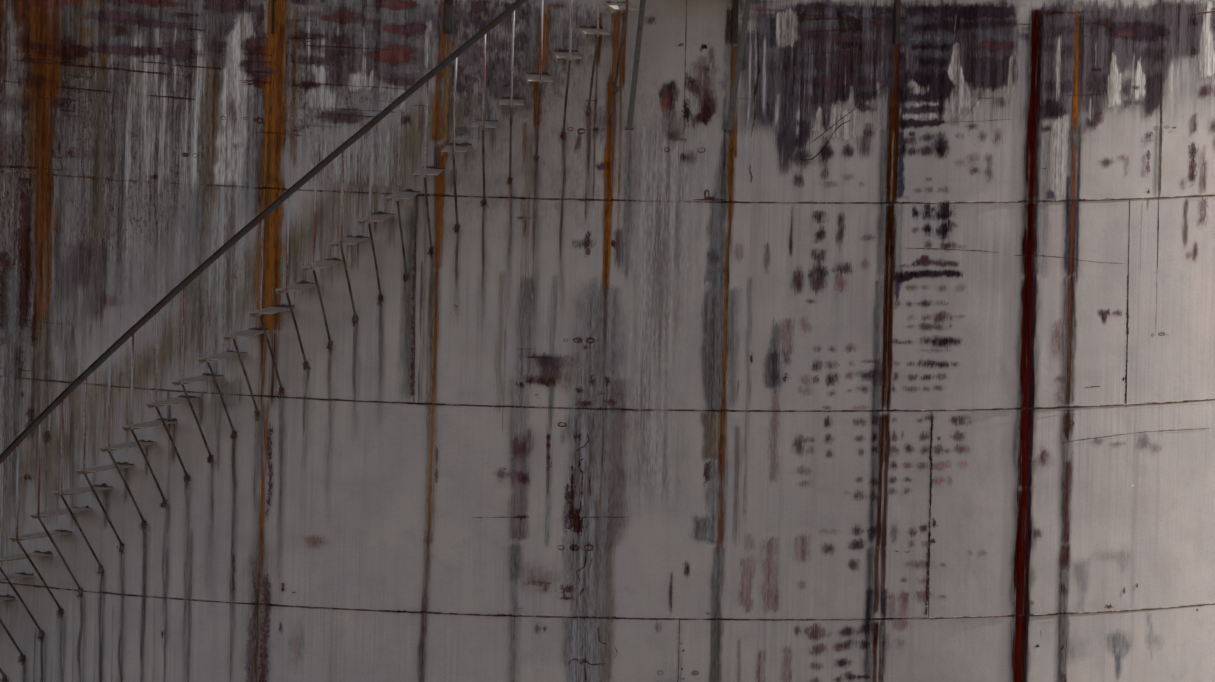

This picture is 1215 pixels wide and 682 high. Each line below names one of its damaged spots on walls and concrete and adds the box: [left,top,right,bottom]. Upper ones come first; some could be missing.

rust [0,0,127,435]
rust [197,0,521,682]
rust [479,1,654,595]
rust [659,50,716,141]
rust [703,8,1125,682]
rust [569,611,684,682]